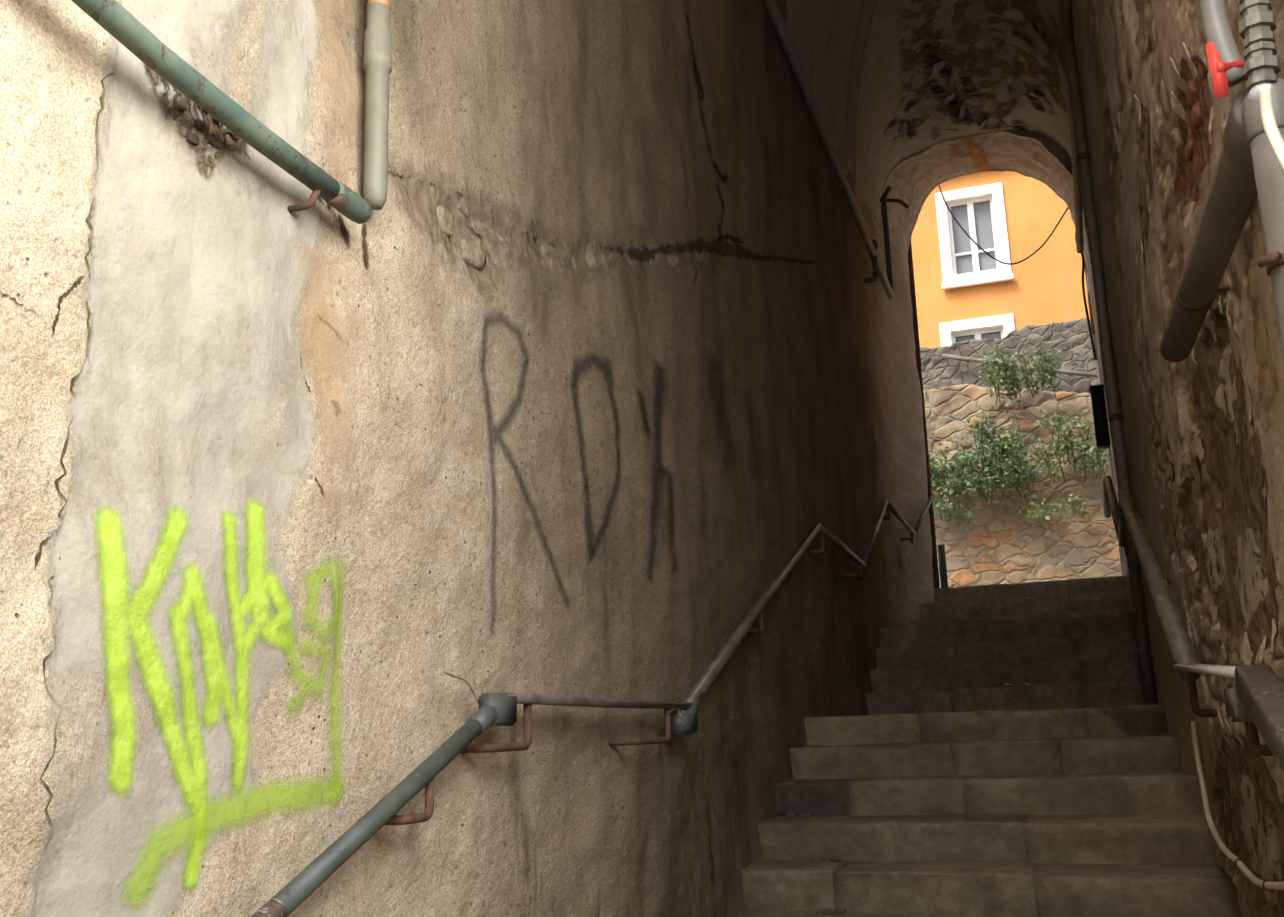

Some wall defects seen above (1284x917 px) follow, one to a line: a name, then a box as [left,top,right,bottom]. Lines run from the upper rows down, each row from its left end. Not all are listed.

spalling [390,166,712,289]
crack [609,14,812,287]
peeling [884,0,1067,141]
crack [0,72,114,850]